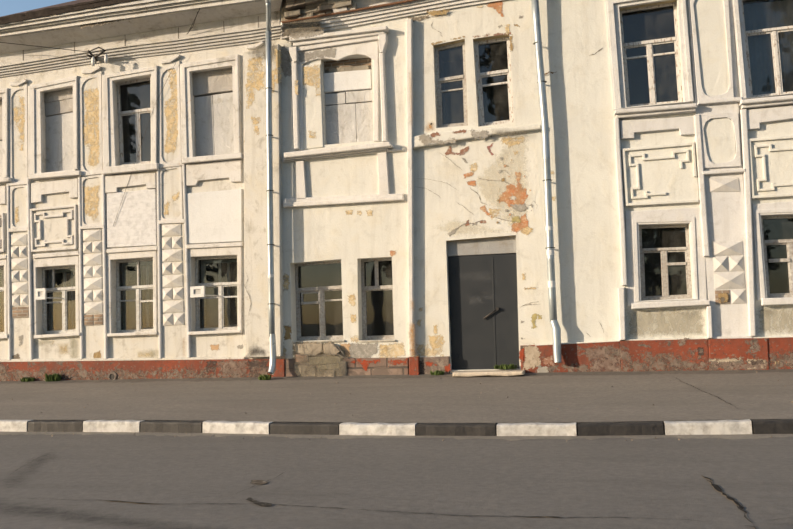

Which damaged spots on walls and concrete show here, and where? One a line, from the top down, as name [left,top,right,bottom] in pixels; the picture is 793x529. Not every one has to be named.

spalling [408,9,450,22]
peeling [454,0,523,50]
peeling [245,17,336,133]
peeling [83,88,100,166]
peeling [164,69,178,154]
peeling [83,185,99,219]
crack [418,170,509,236]
peeling [419,129,533,235]
spalling [281,325,451,375]
peeling [519,338,793,373]